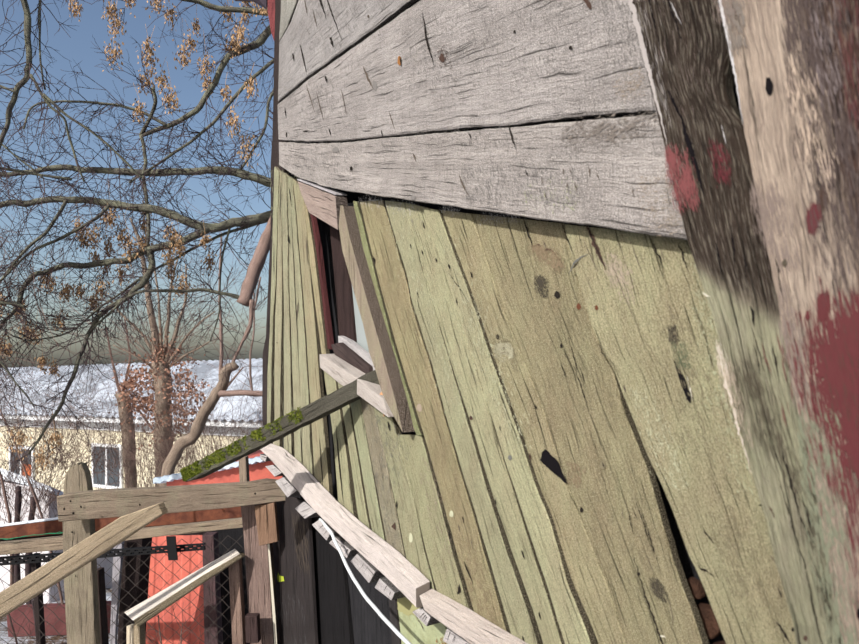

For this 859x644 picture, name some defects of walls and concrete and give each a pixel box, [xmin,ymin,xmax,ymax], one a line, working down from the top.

peeling [664,143,700,216]
peeling [777,251,859,622]
crack [622,503,673,644]